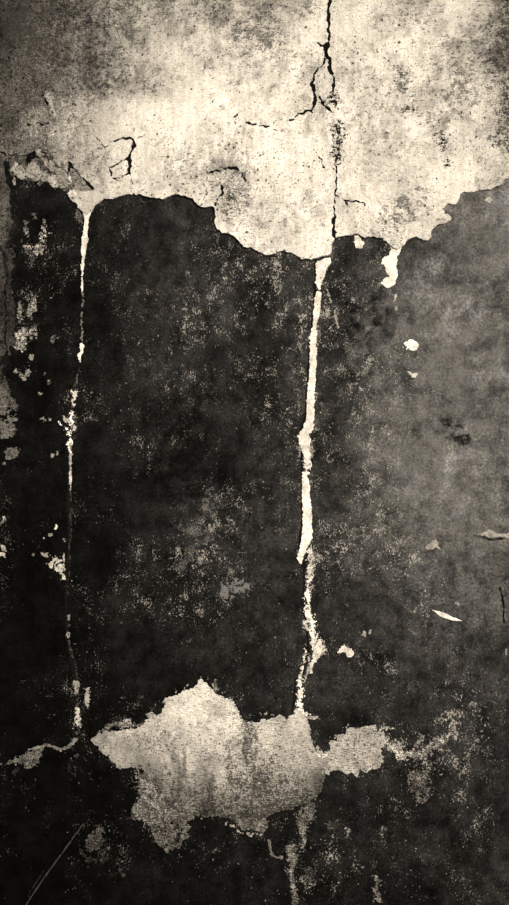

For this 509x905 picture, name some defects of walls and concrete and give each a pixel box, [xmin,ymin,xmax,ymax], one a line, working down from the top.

crack [234,0,336,131]
crack [97,135,145,195]
peeling [0,133,509,260]
crack [316,152,366,240]
peeling [6,292,51,396]
water stain [297,257,331,476]
peeling [404,339,419,351]
peeling [32,552,66,580]
water stain [295,545,327,716]
peeling [337,644,354,657]
peeling [0,738,79,776]
spalling [91,676,471,905]